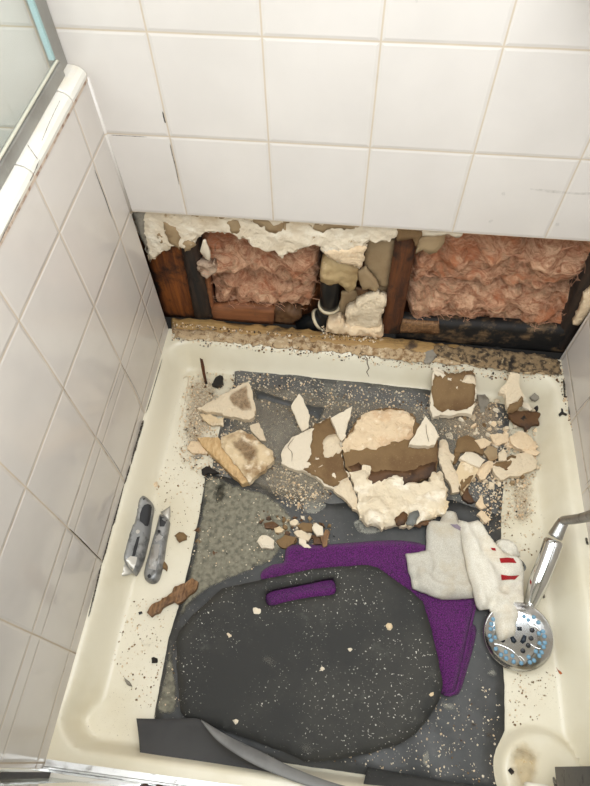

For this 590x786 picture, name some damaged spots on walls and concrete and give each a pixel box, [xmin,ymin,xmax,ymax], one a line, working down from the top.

peeling [131,212,398,269]
spalling [572,286,590,326]